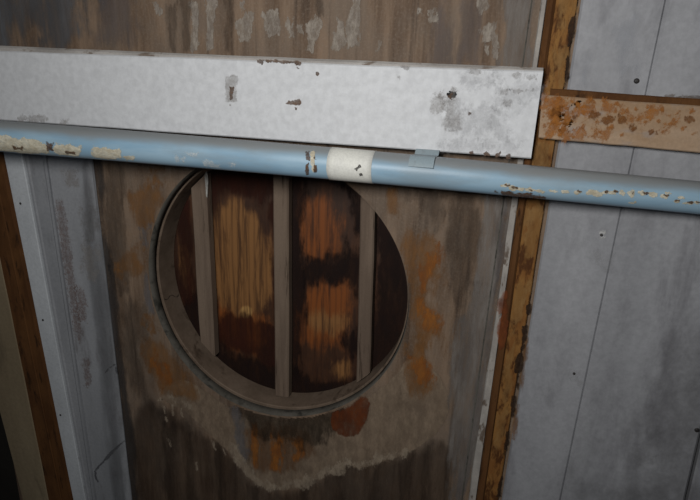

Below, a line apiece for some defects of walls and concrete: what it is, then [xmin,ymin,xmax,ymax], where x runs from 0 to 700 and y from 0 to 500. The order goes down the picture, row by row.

peeling [257,59,301,69]
rust [540,95,695,143]
peeling [0,135,82,157]
peeling [91,147,135,161]
peeling [500,183,700,205]
damp [160,357,449,490]
rust [331,397,370,437]